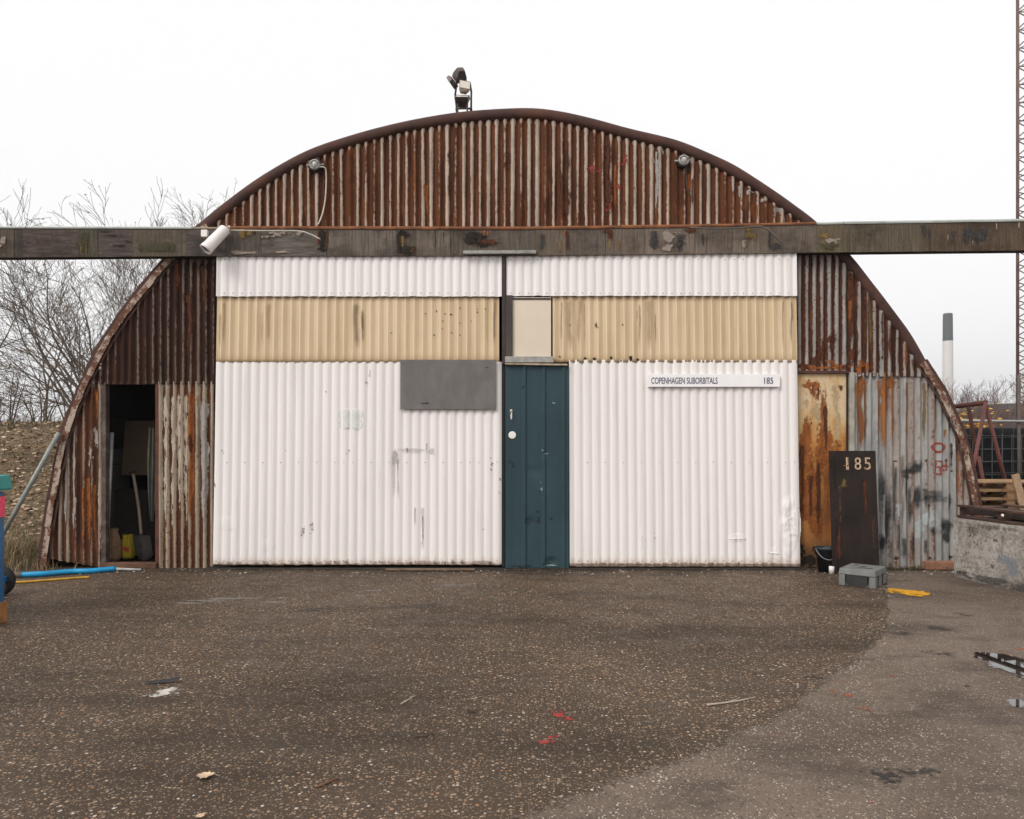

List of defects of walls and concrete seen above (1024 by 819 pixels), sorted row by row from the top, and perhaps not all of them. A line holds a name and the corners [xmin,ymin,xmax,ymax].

corrosion [414,155,428,213]
corrosion [559,141,571,217]
corrosion [603,145,617,208]
corrosion [797,270,908,536]
corrosion [922,383,937,433]
corrosion [187,392,195,519]
peeling [162,394,224,534]
corrosion [944,430,964,509]
corrosion [82,478,96,542]